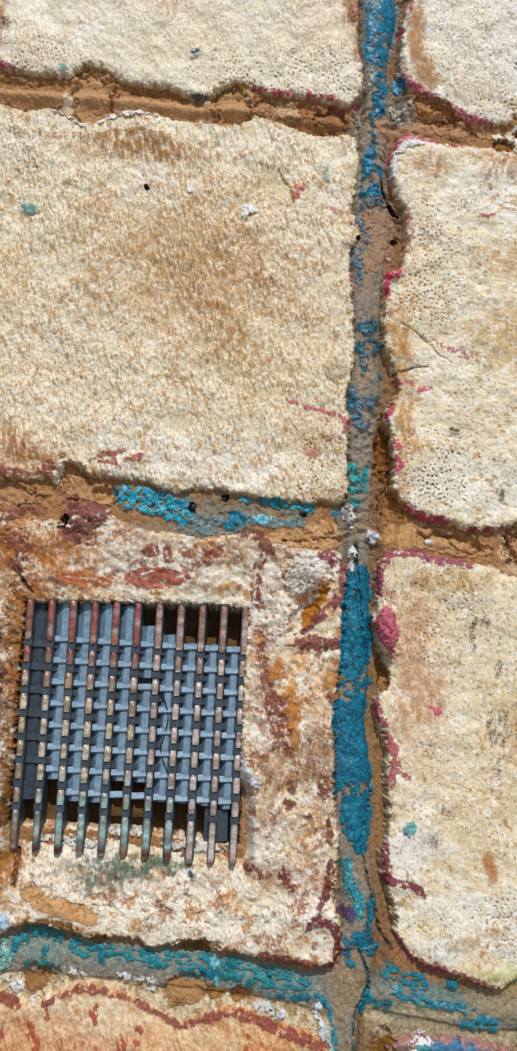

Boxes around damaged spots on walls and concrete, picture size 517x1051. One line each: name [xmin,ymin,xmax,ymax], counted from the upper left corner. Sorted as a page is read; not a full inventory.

crack [362,854,391,948]
crack [352,956,369,1051]